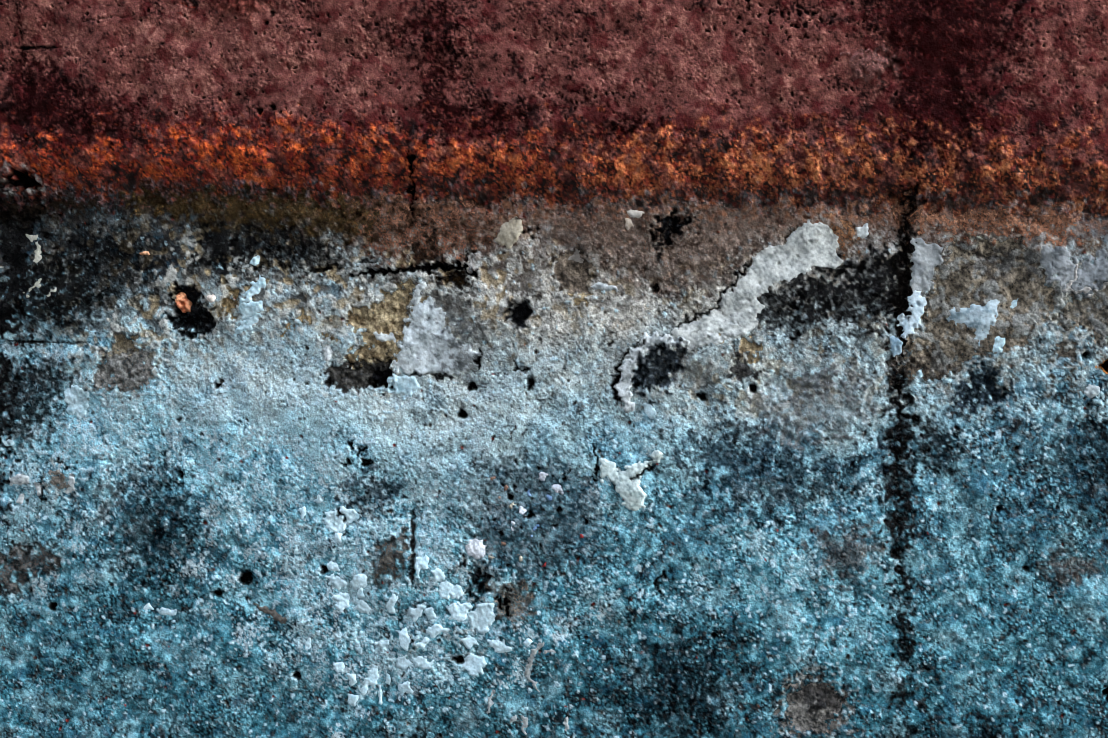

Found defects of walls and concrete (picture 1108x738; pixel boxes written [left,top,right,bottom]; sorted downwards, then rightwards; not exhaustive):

leakage [189,213,342,285]
spalling [0,104,1108,421]
corrosion [537,194,795,299]
leakage [0,187,164,559]
leakage [88,433,212,603]
peeling [299,494,362,543]
flaking render [342,441,373,467]
peeling [325,446,664,706]